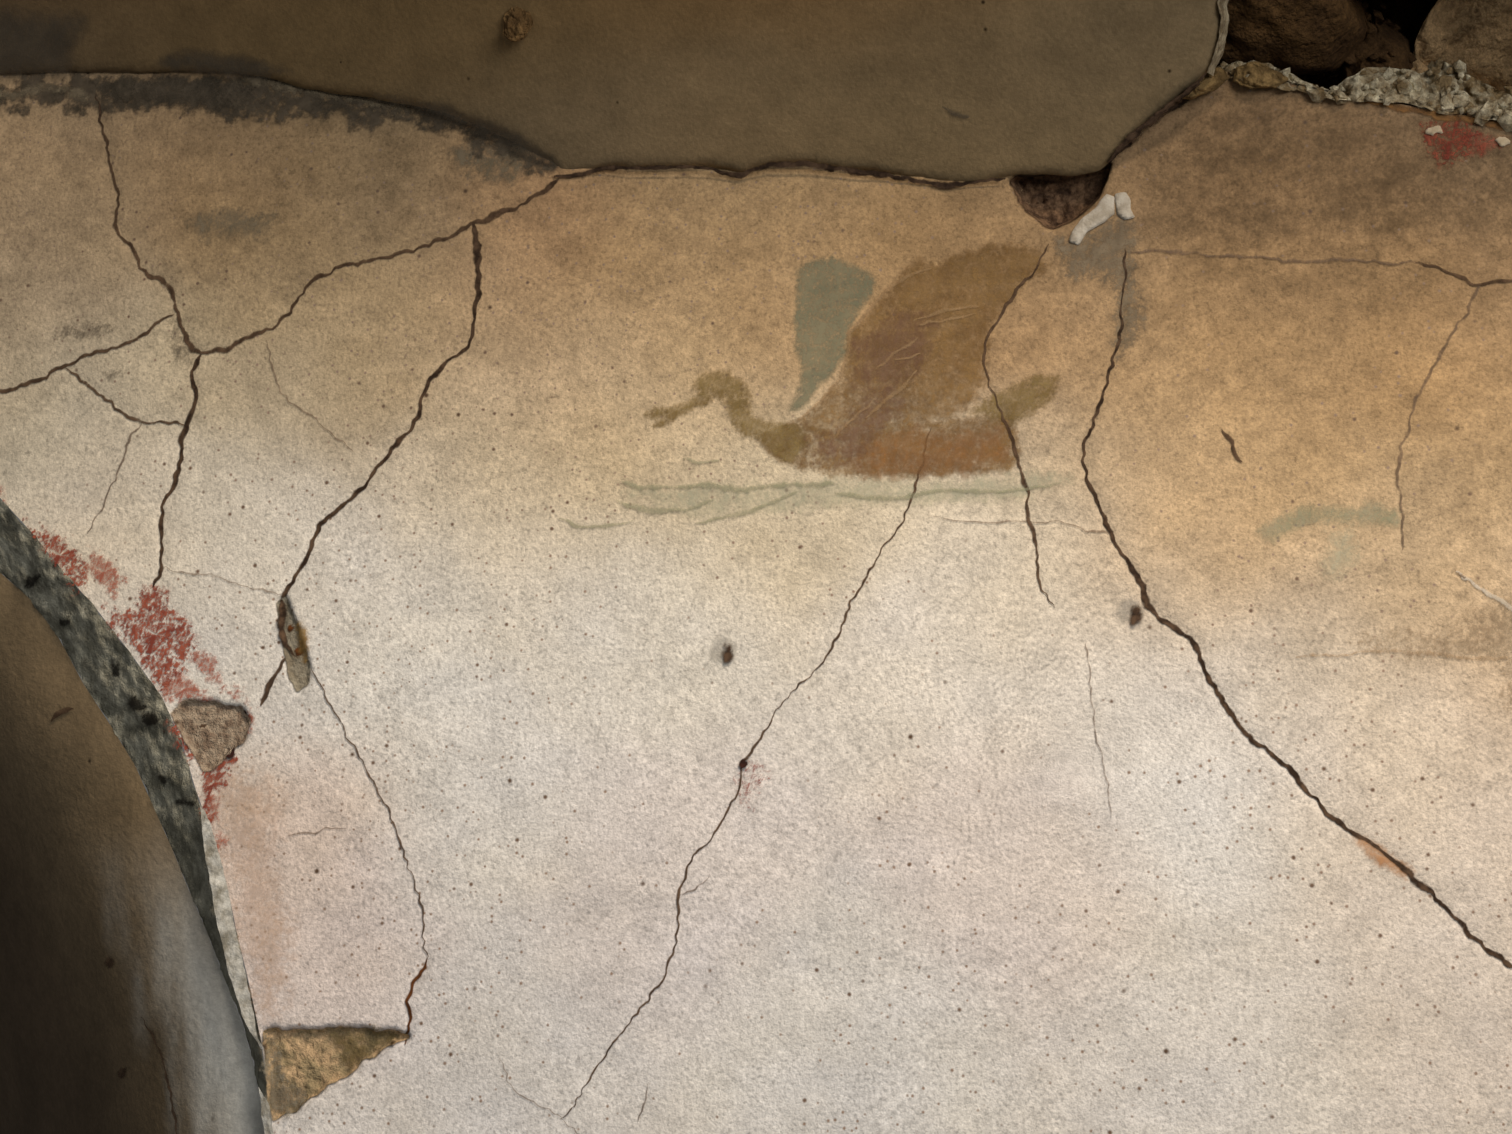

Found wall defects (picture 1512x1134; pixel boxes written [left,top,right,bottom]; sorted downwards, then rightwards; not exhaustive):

crack [1108,73,1206,165]
crack [0,95,1005,599]
peeling [22,518,127,599]
spalling [110,659,120,677]
crack [503,244,1512,1134]
spalling [127,651,253,849]
crack [260,658,429,1044]
crack [141,1017,177,1134]
spalling [262,1025,409,1120]